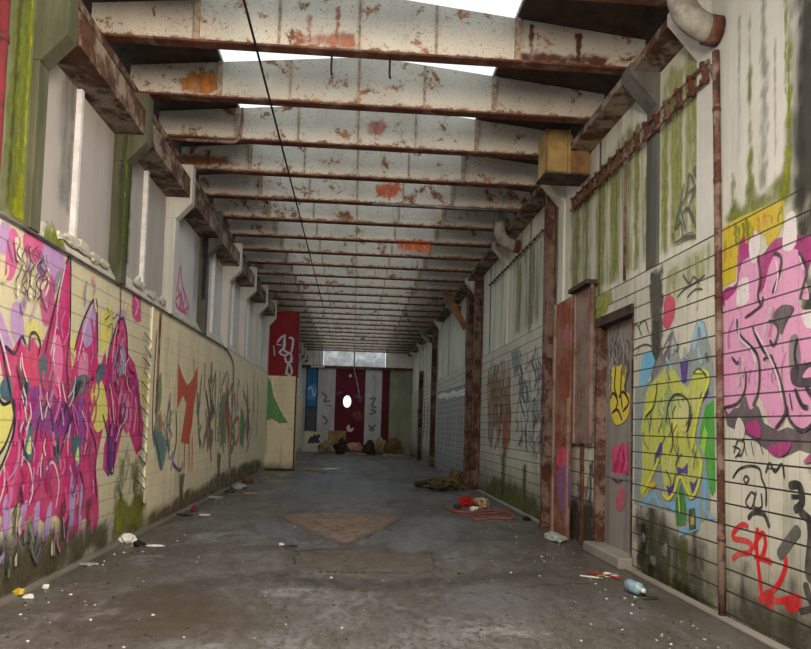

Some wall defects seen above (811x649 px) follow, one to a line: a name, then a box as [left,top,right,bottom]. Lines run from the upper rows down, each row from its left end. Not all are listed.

water stain [9,84,29,176]
water stain [14,0,33,95]
corrosion [180,68,217,95]
corrosion [182,150,232,165]
corrosion [300,7,355,47]
corrosion [521,24,607,65]
water stain [663,109,682,252]
water stain [784,0,811,236]
water stain [149,453,261,525]
water stain [0,499,107,594]
water stain [636,506,705,601]